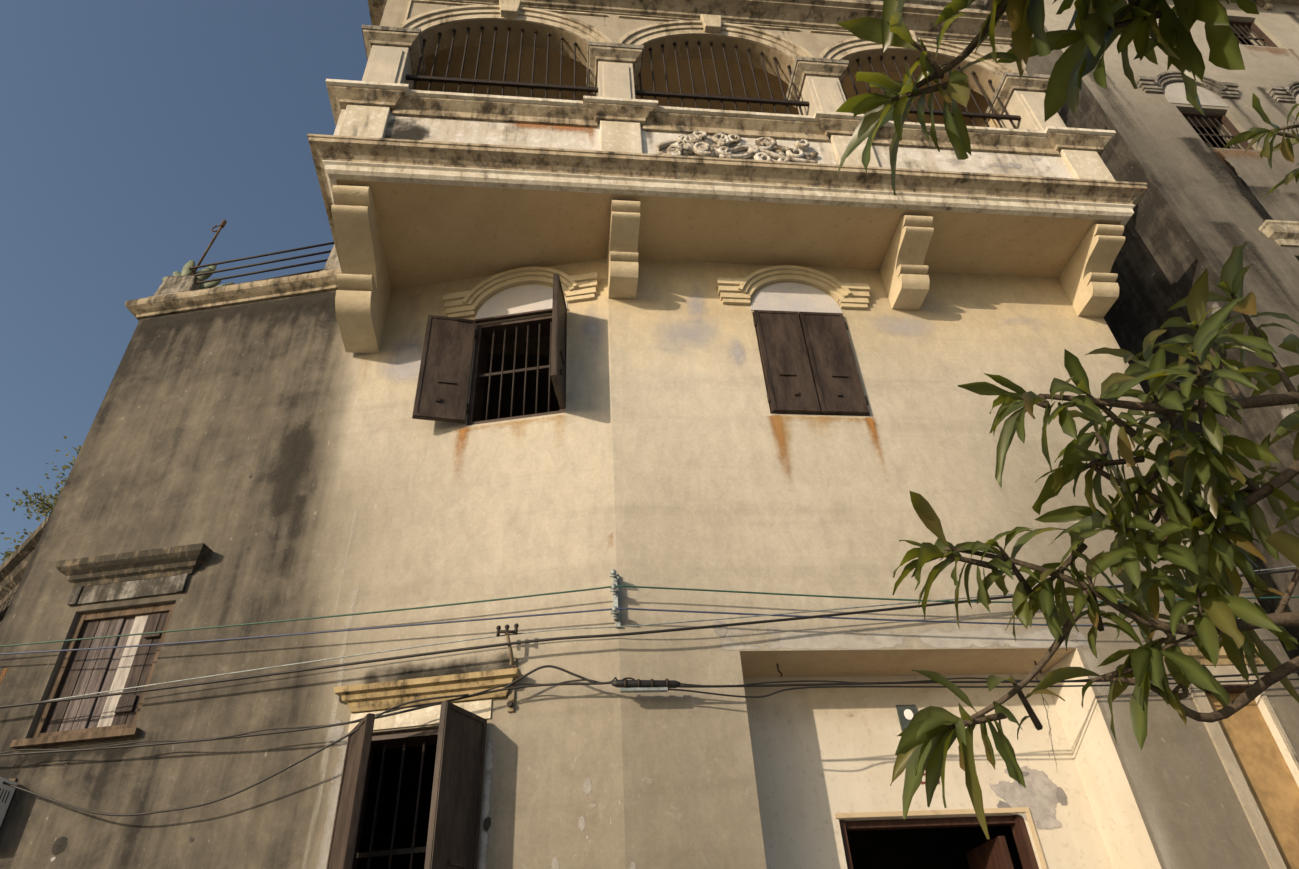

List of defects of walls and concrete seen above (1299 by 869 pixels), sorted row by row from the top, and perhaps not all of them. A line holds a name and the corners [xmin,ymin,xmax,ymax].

corrosion [770,415,786,457]
corrosion [865,418,879,448]
damp [272,422,313,527]
damp [365,657,510,684]
flaking render [990,767,1067,829]